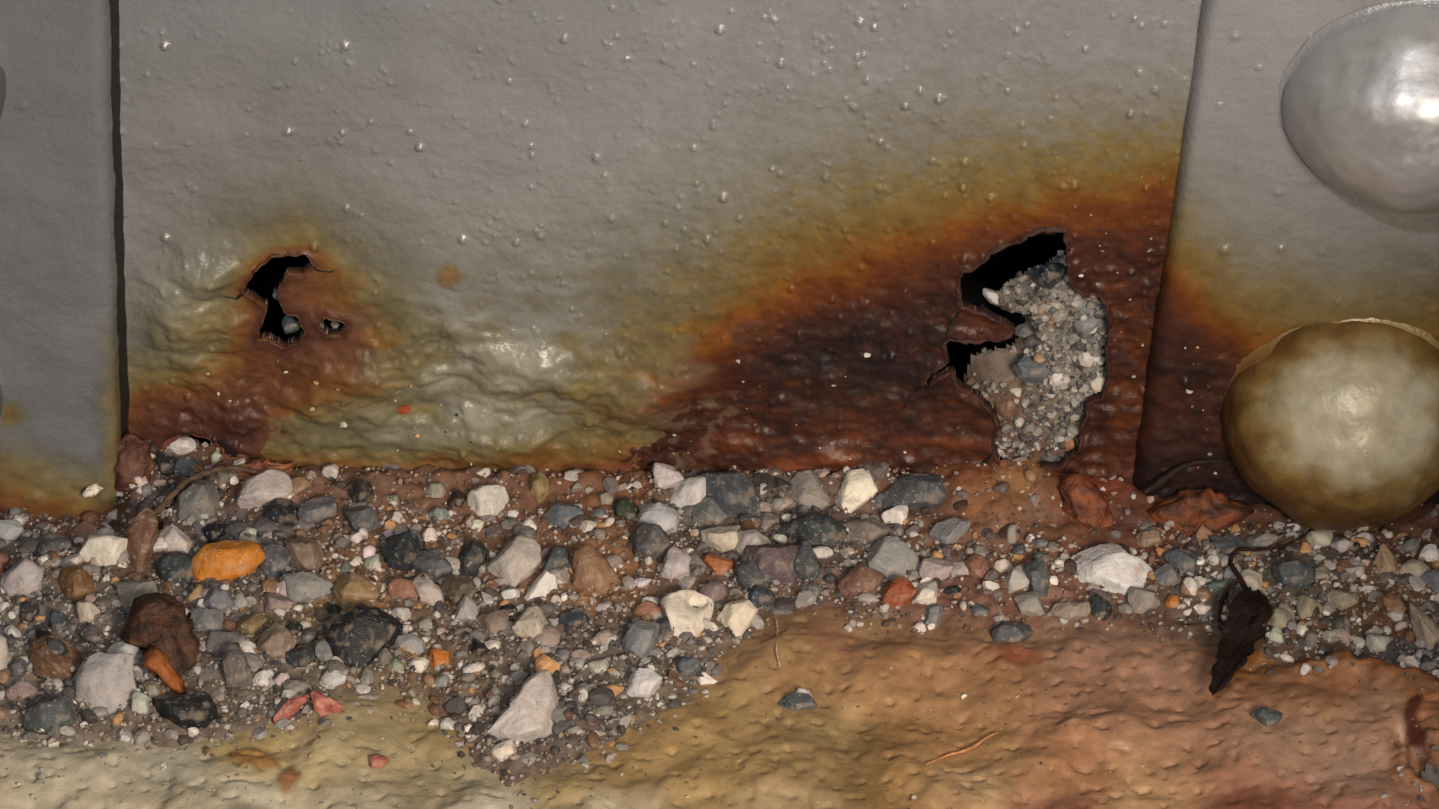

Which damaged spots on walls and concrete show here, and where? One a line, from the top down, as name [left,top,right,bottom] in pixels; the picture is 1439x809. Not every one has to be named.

rust [0,112,1439,531]
rust [231,749,300,791]
rust [614,612,1439,809]